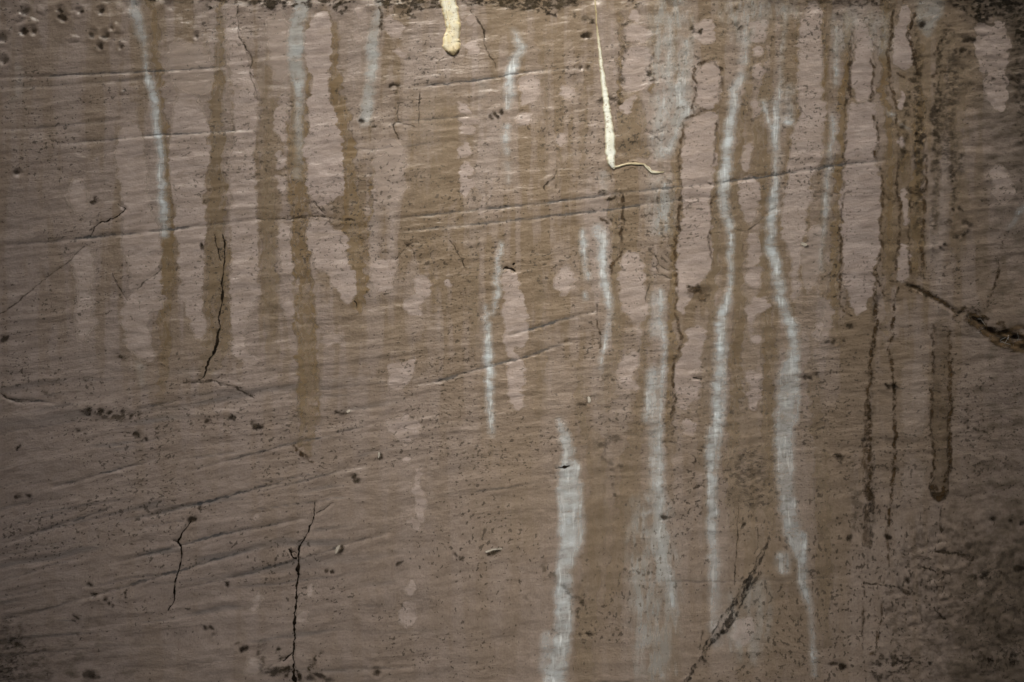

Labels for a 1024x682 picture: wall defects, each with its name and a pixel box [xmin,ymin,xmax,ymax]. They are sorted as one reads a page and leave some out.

damp [132,0,177,368]
damp [203,0,233,363]
crack [184,234,254,398]
damp [256,0,320,425]
damp [328,23,379,313]
damp [484,316,493,428]
damp [616,16,690,606]
damp [704,35,807,596]
damp [820,14,852,331]
crack [168,522,191,611]
crack [283,502,334,682]
damp [545,430,604,682]